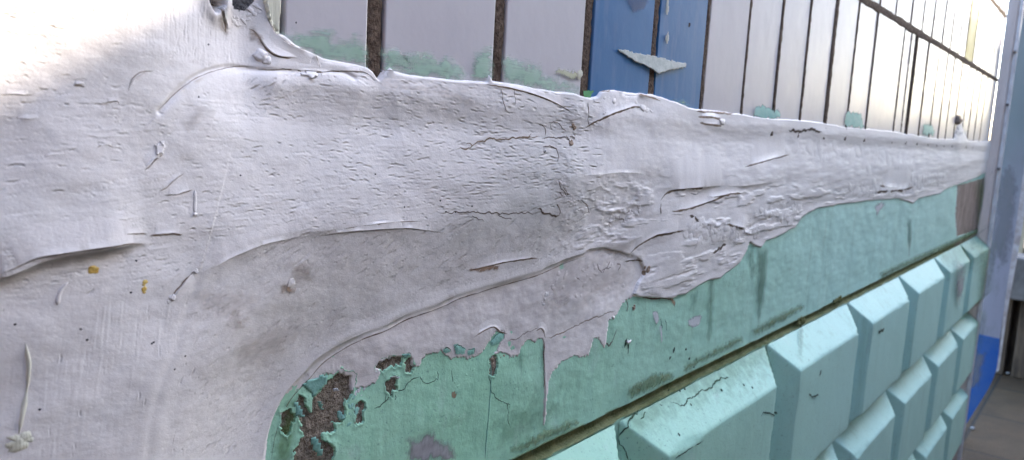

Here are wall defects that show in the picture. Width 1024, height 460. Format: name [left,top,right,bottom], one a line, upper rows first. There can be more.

crack [460,106,589,162]
flaking render [319,211,442,236]
flaking render [606,153,751,262]
peeling [848,158,984,246]
flaking render [642,287,673,300]
flaking render [264,245,587,460]
crack [619,377,729,459]